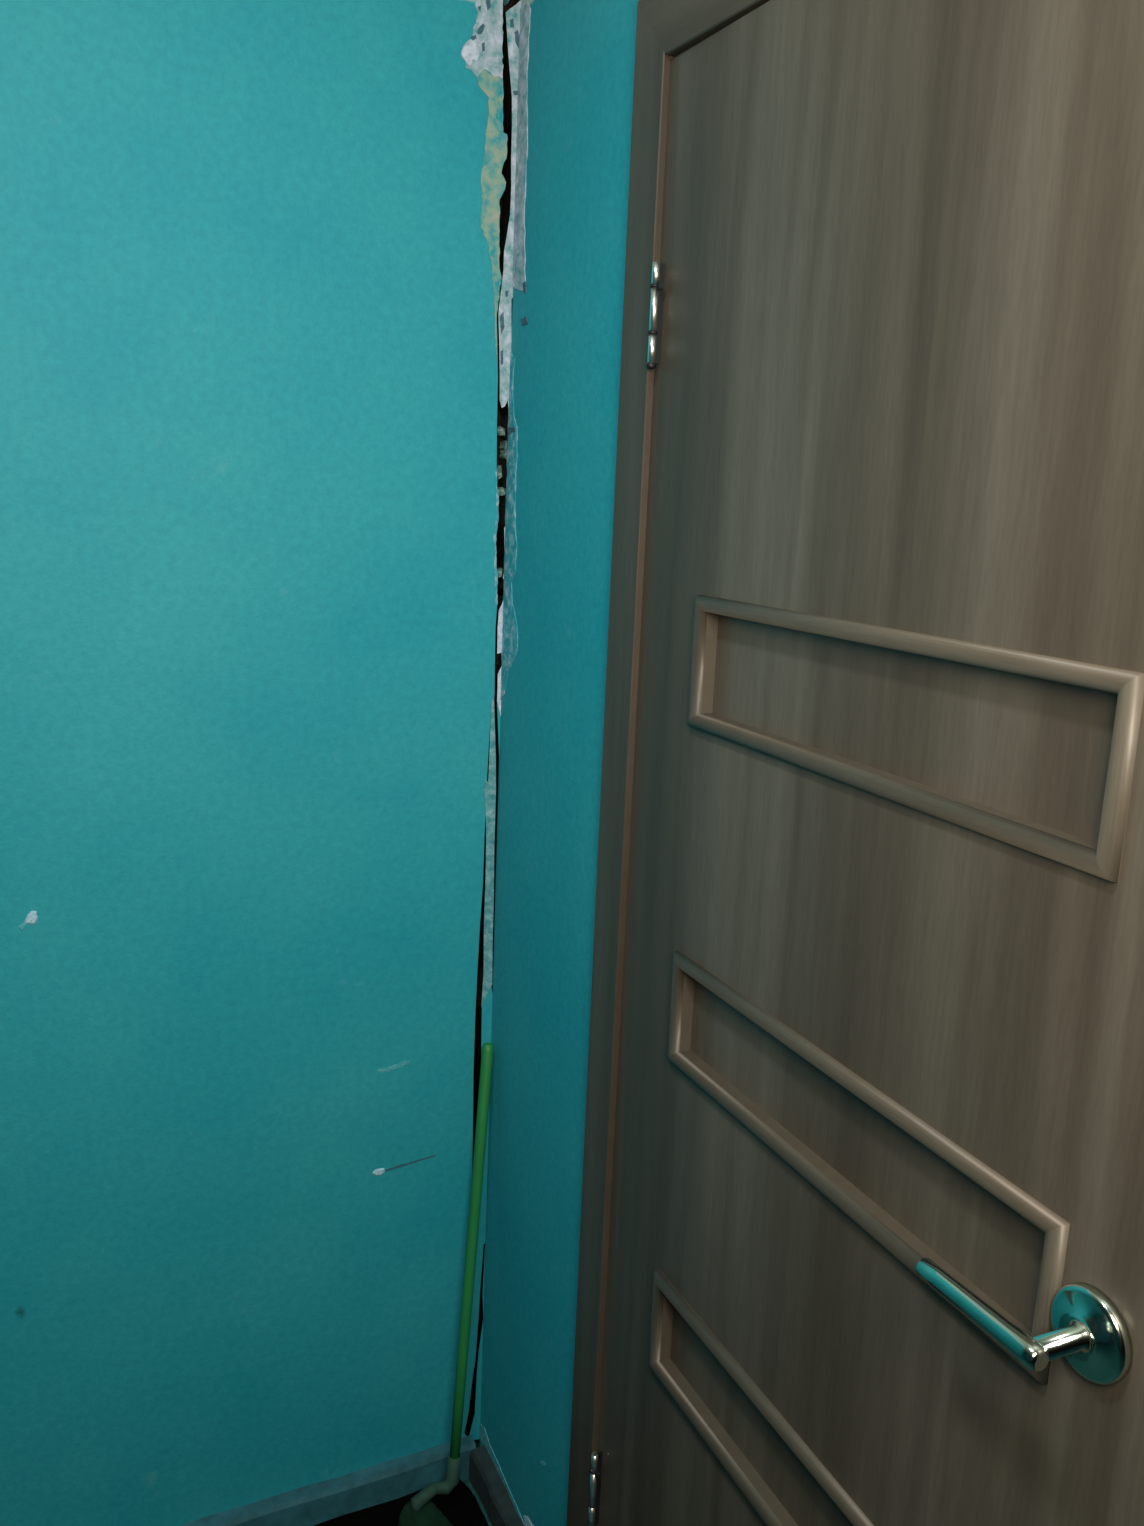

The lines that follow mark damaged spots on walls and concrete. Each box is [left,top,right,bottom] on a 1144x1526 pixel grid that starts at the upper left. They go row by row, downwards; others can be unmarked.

flaking render [461,0,531,717]
crack [494,0,519,787]
crack [464,1246,485,1434]
crack [472,837,492,1165]